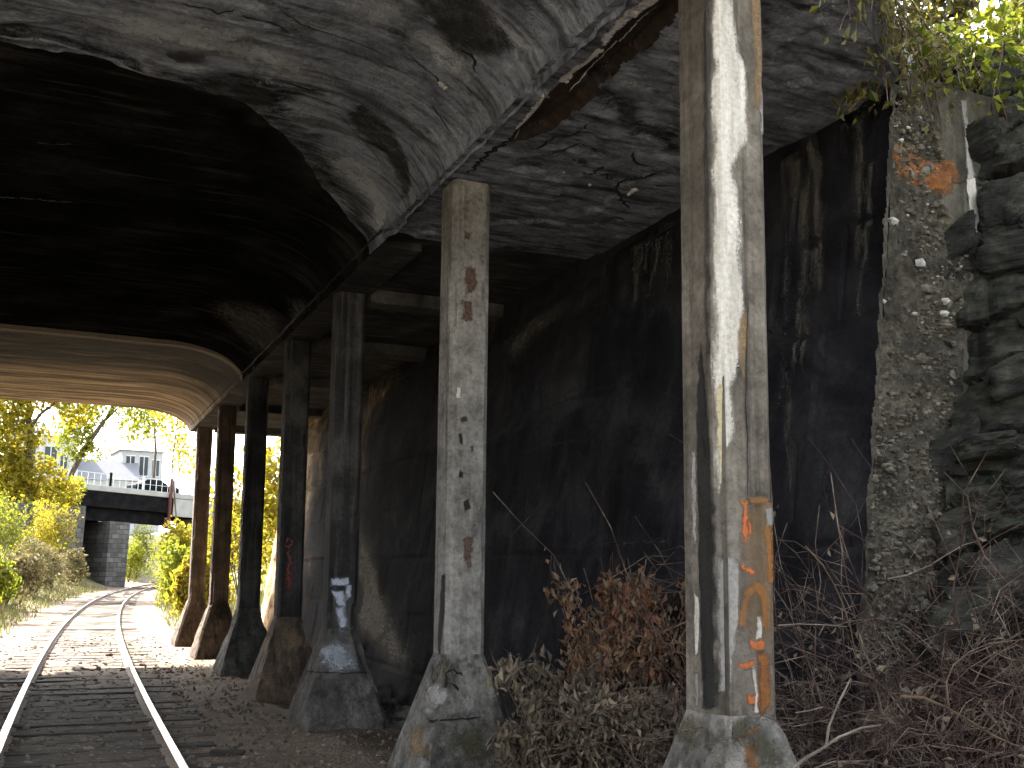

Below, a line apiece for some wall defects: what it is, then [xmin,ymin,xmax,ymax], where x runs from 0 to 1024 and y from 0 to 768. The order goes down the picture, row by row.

spalling [511,0,679,143]
corrosion [462,267,477,322]
crack [467,124,672,209]
leakage [710,0,748,489]
leakage [780,137,823,513]
leakage [839,115,873,312]
corrosion [893,143,958,194]